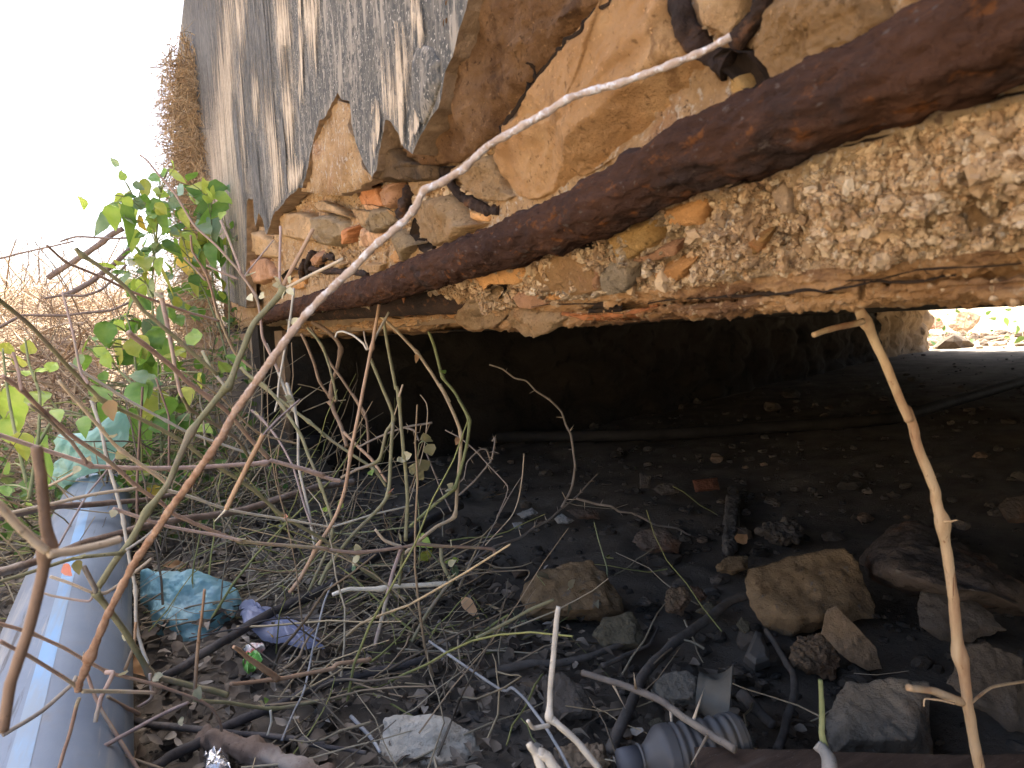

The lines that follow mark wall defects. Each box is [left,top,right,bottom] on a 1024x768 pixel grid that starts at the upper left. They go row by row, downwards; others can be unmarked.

rust [974,91,1024,108]
rust [841,133,894,147]
spalling [202,0,1024,338]
rust [561,304,660,321]